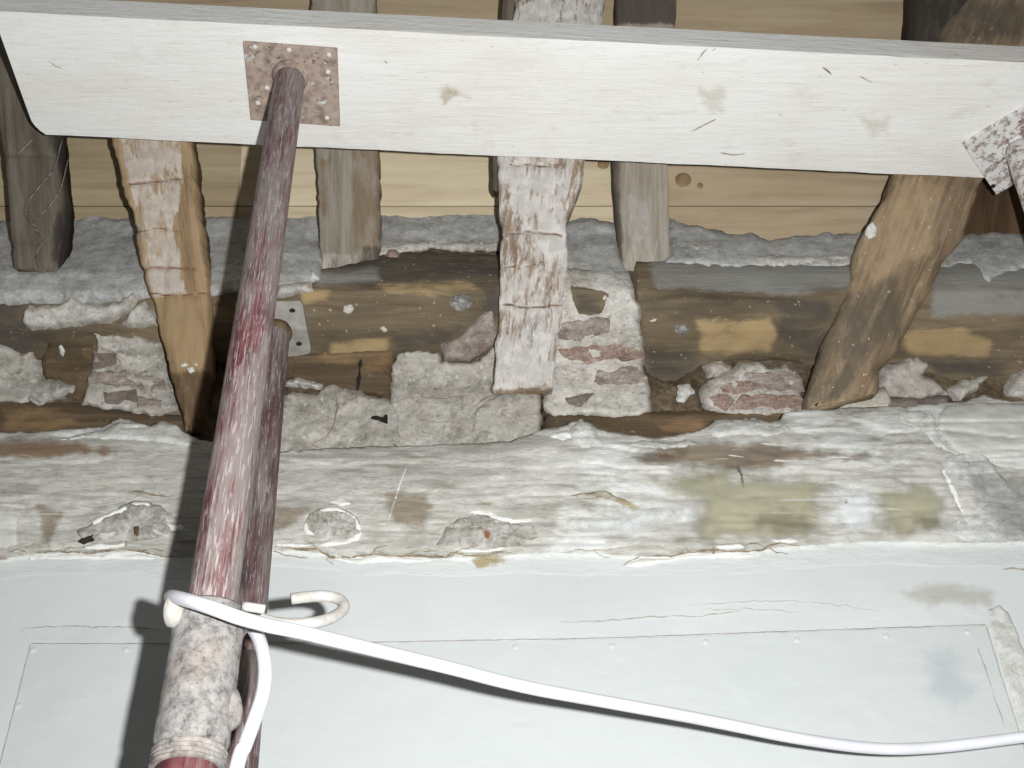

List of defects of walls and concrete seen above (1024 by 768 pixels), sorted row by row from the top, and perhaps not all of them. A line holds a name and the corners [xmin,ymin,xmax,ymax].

crack [9,540,171,560]
spalling [77,500,184,545]
spalling [303,499,361,547]
spalling [436,514,538,548]
crack [560,537,799,567]
water stain [594,443,869,539]
water stain [837,485,942,534]
peeling [987,605,1024,731]